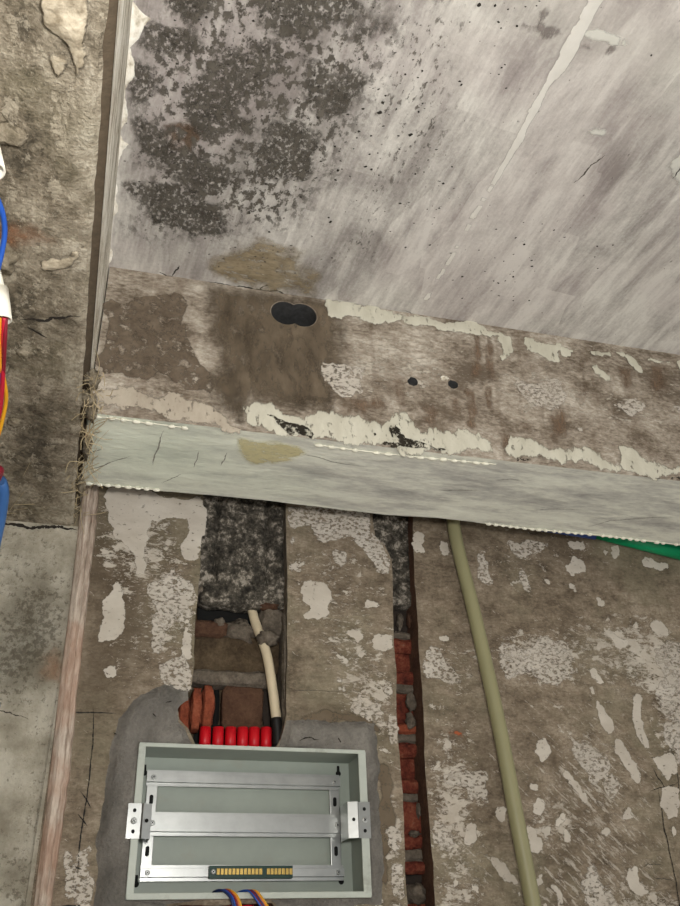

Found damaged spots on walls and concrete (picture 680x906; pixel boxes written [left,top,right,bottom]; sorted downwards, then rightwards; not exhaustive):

water stain [124,0,448,241]
water stain [208,243,342,422]
peeling [95,293,513,457]
crack [5,522,76,530]
peeling [98,581,126,642]
peeling [104,487,207,575]
peeling [147,569,251,745]
peeling [411,531,425,553]
peeling [505,436,680,481]
peeling [563,668,641,803]
peeling [650,620,680,837]
crack [644,750,680,906]